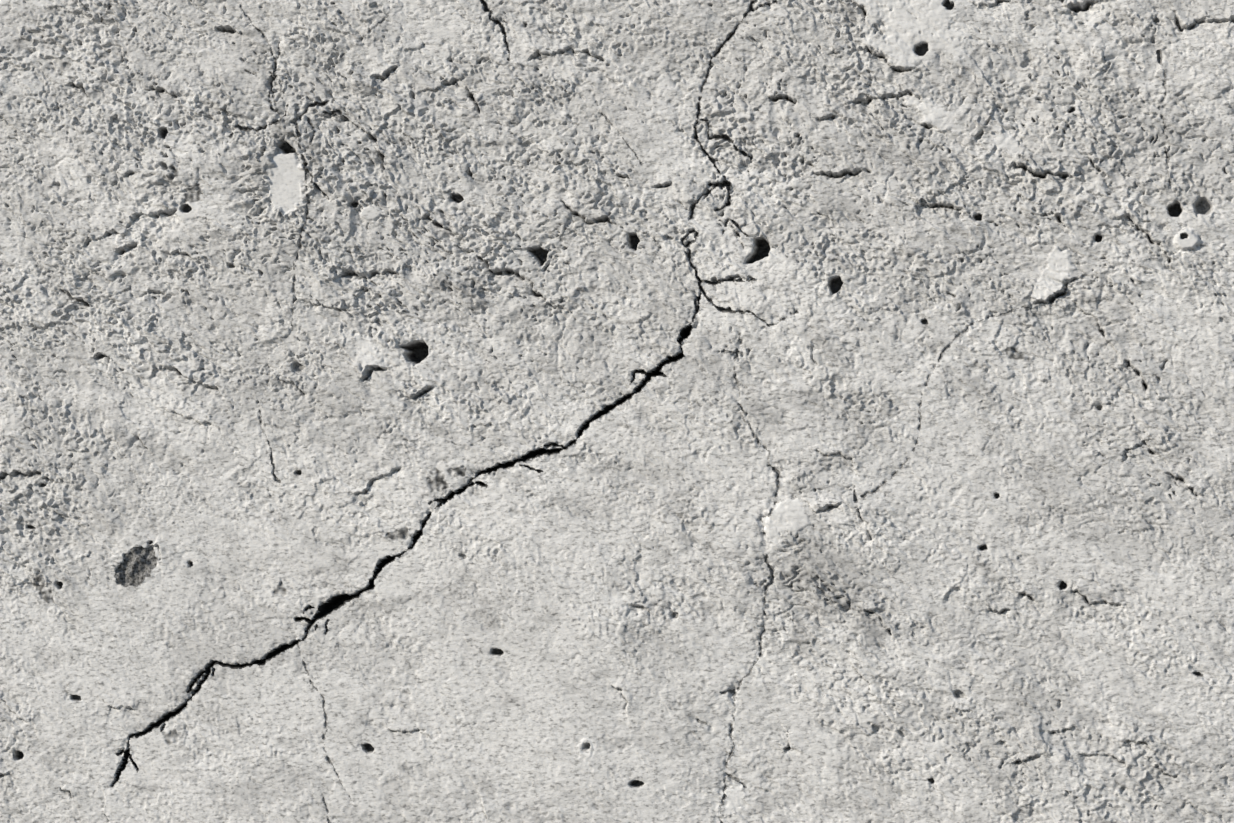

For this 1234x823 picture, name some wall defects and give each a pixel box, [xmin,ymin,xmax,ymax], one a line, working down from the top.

crack [111,0,799,823]